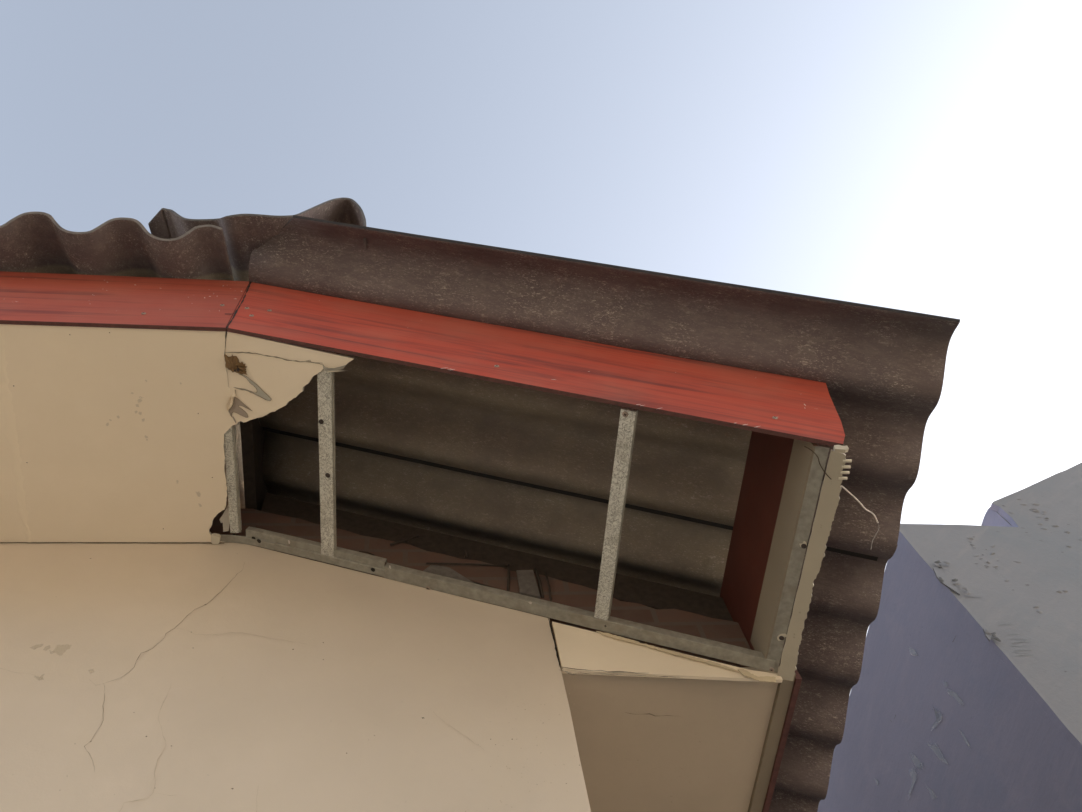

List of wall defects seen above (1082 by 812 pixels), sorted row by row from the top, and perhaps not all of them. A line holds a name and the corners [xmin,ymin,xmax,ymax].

flaking render [211,506,230,545]
crack [84,565,304,768]